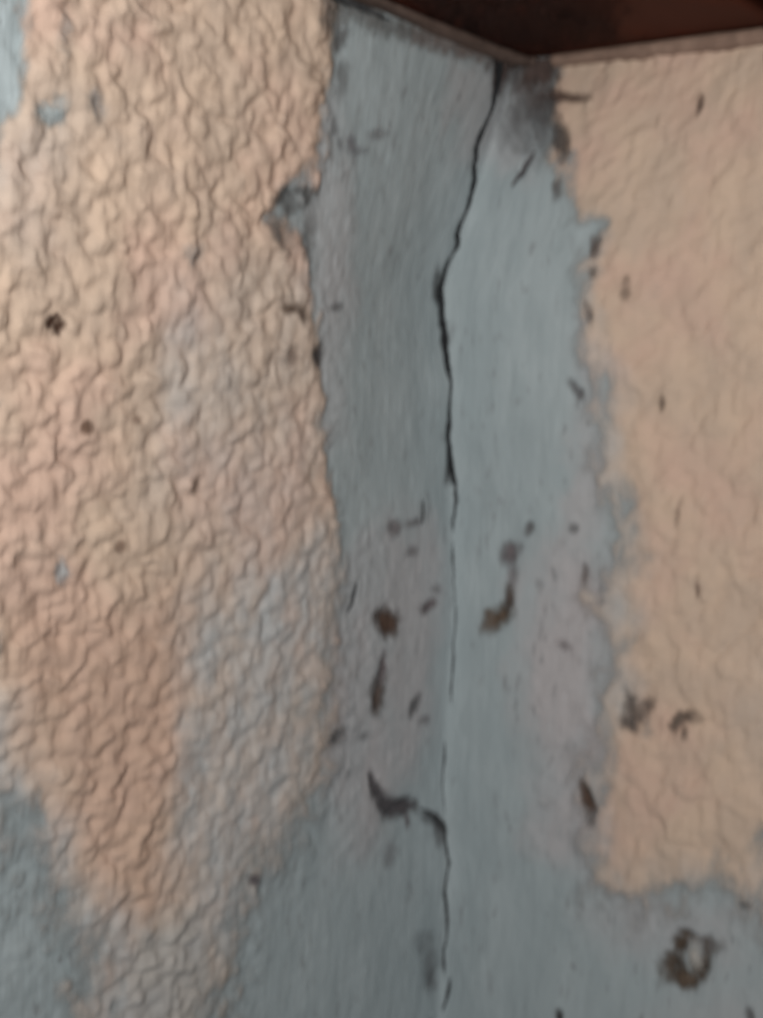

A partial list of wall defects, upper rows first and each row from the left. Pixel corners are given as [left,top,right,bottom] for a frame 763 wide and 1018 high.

peeling [0,0,26,122]
crack [434,60,503,702]
peeling [208,3,763,1018]
rust [483,585,513,630]
rust [502,543,517,563]
crack [420,745,450,1009]